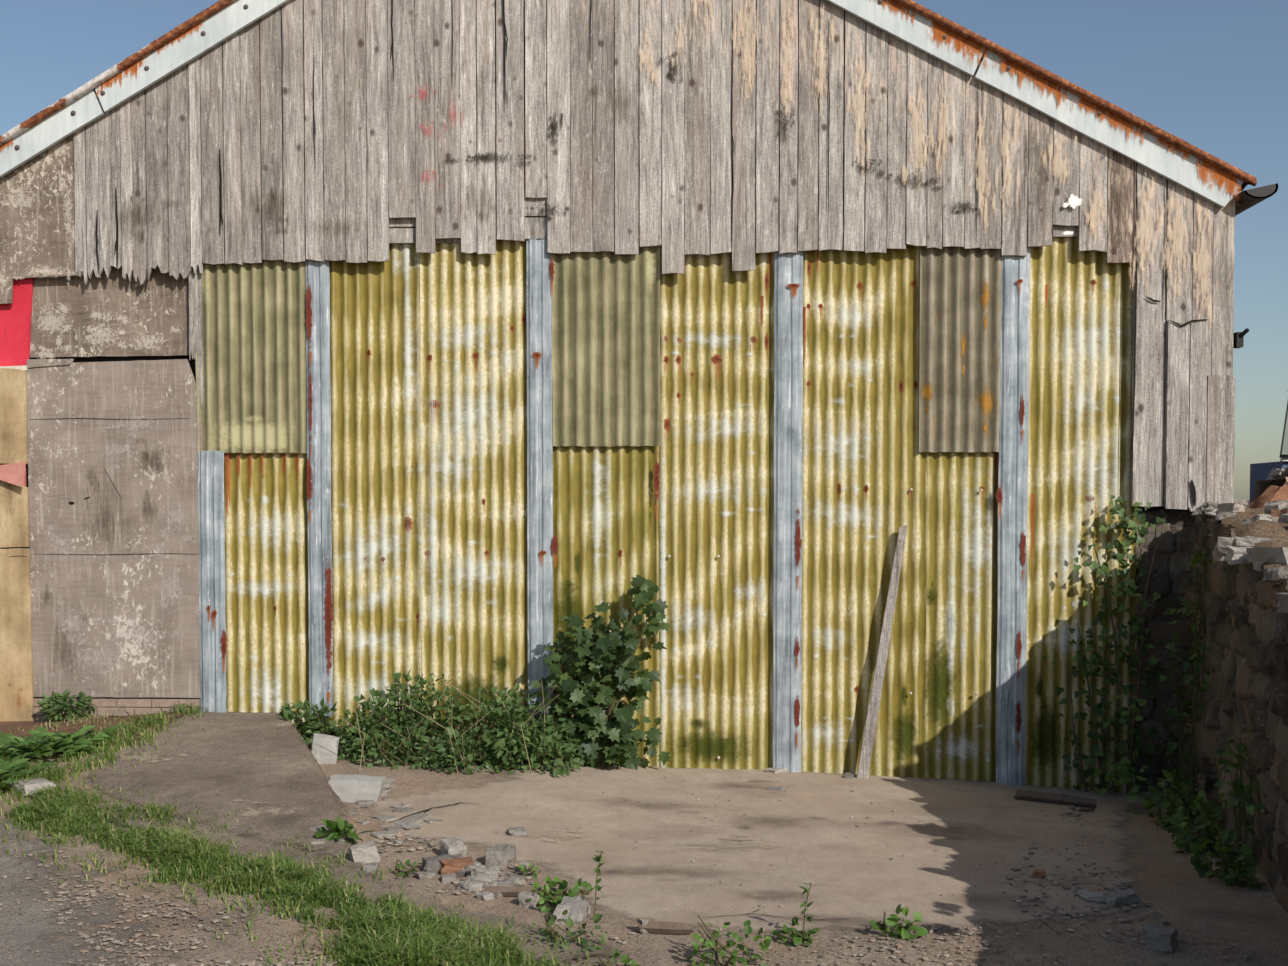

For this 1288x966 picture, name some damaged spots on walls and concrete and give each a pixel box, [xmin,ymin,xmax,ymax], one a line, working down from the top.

rust [157,23,202,54]
rust [870,0,914,25]
rust [97,59,143,94]
rust [928,21,1241,202]
peeling [0,462,26,487]
rust [1020,494,1036,577]
rust [324,557,334,702]
leakage [448,658,506,724]
leakage [680,720,735,760]
leakage [895,688,916,759]
leakage [926,612,955,725]